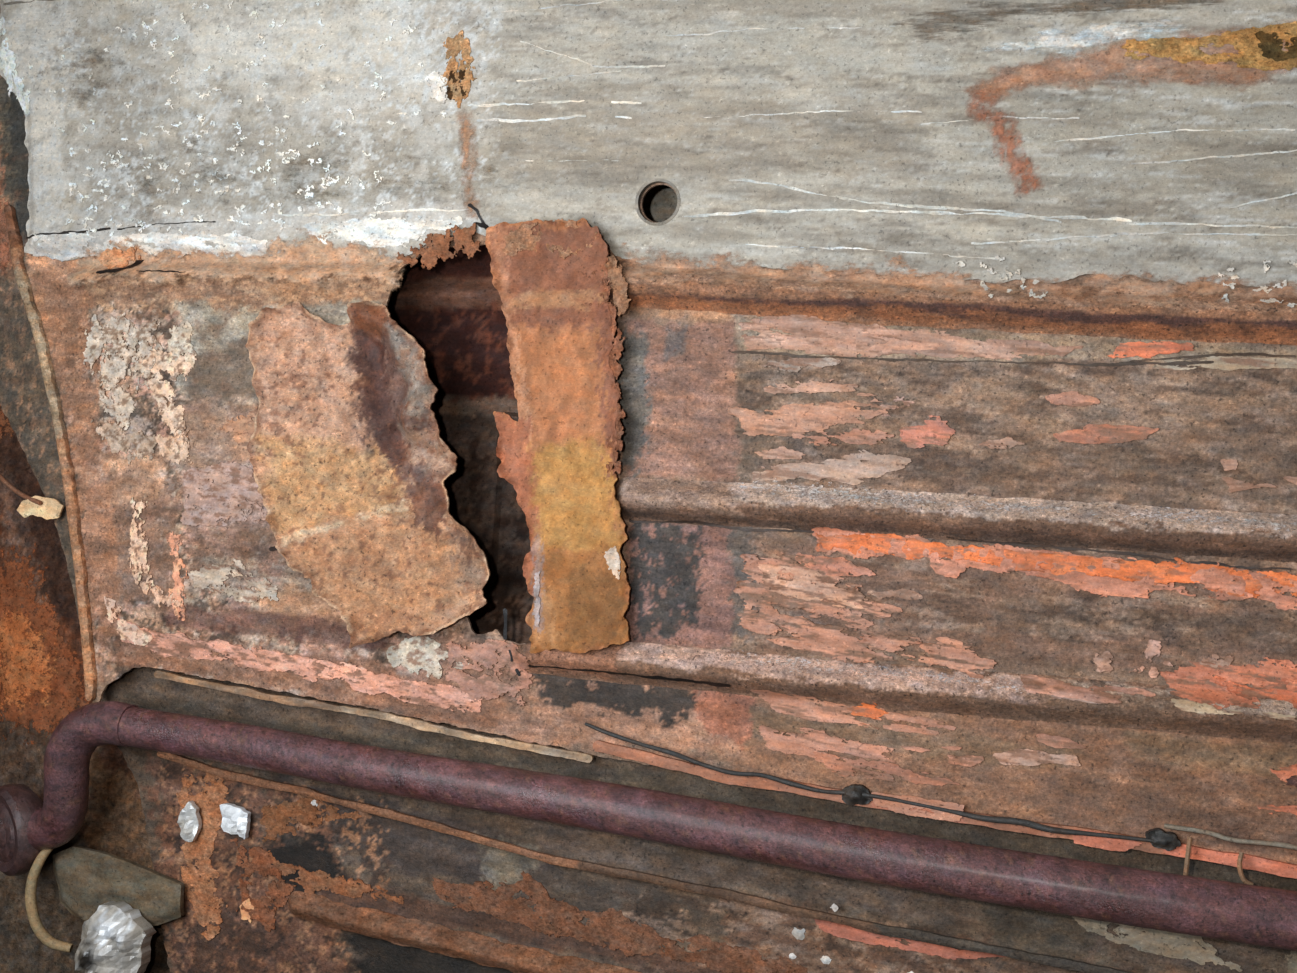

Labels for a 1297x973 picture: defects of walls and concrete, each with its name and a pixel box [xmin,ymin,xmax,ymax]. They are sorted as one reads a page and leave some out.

crack [4,0,53,8]
corrosion [66,30,481,294]
peeling [303,215,463,248]
corrosion [502,219,597,259]
corrosion [969,21,1297,193]
peeling [727,314,1083,485]
peeling [1108,341,1297,371]
peeling [83,312,533,713]
corrosion [0,542,90,745]
peeling [733,527,1297,679]
peeling [1020,639,1297,722]
corrosion [176,772,404,941]